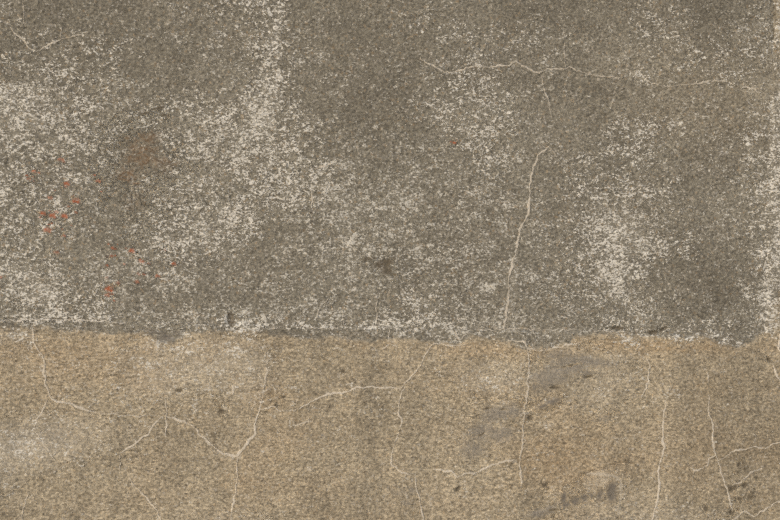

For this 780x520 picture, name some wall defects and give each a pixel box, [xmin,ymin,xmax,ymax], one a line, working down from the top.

corrosion [106,122,184,221]
crack [0,146,621,520]
crack [641,358,651,398]
crack [772,333,780,381]
crack [652,402,667,520]
crack [687,362,780,520]